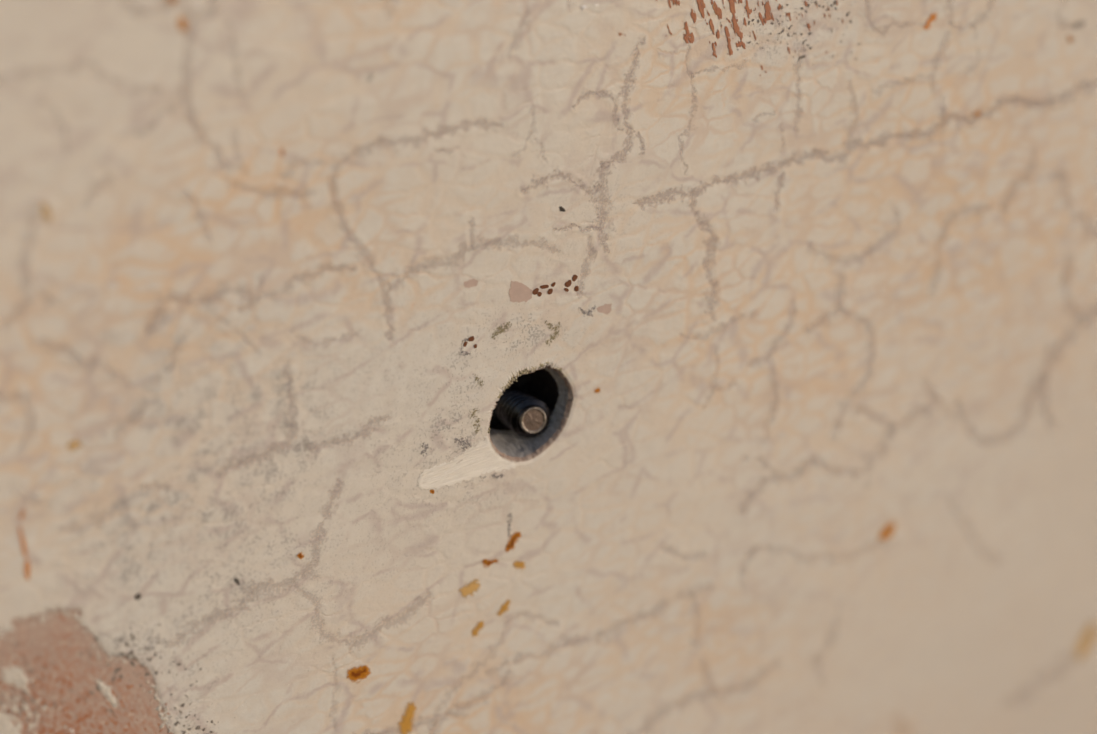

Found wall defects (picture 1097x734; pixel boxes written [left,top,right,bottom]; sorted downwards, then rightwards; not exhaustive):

peeling [656,0,852,68]
corrosion [483,532,525,569]
corrosion [459,580,480,598]
peeling [0,605,215,734]
corrosion [347,665,370,682]
corrosion [398,703,416,734]